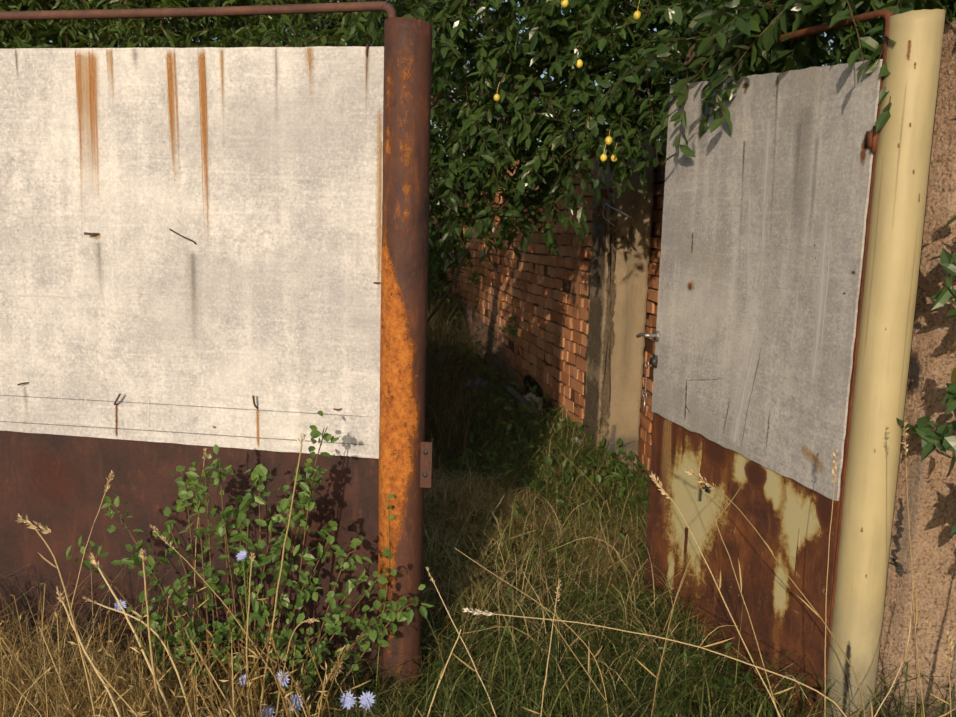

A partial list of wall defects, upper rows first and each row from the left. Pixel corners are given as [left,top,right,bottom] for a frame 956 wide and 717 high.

corrosion [75,52,97,132]
corrosion [167,54,178,137]
corrosion [198,56,207,182]
corrosion [377,78,418,592]